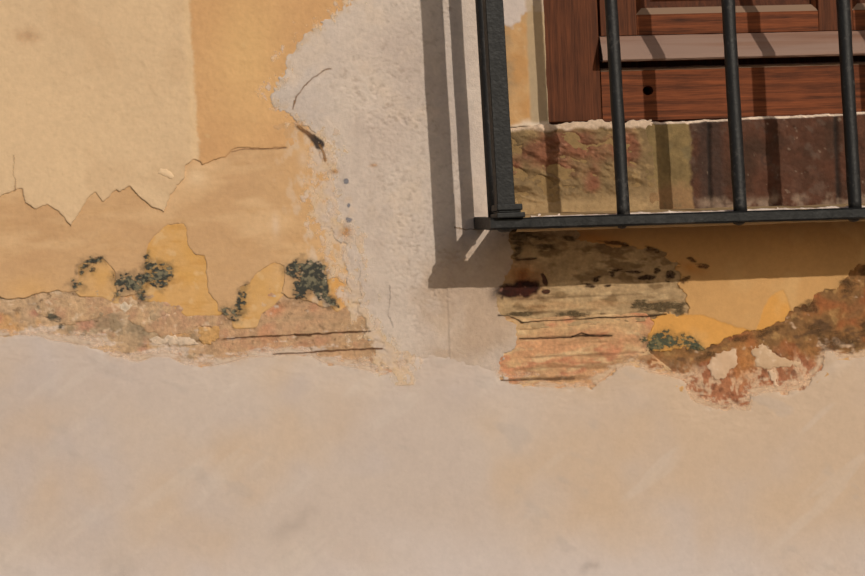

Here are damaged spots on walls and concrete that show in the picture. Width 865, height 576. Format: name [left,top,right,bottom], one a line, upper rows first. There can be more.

peeling [0,122,407,374]
leakage [71,256,103,289]
leakage [113,254,174,301]
leakage [222,284,247,321]
leakage [285,259,339,308]
leakage [640,329,714,359]
spalling [496,230,865,411]